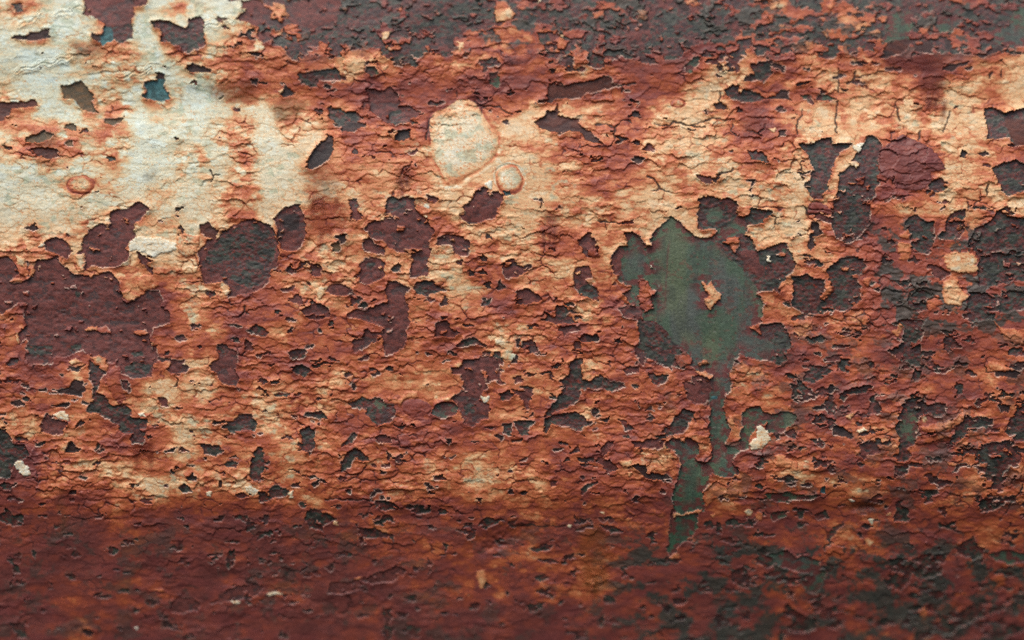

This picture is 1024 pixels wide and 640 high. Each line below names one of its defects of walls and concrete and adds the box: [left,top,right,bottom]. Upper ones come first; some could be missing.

peeling [151,0,1024,175]
crack [595,92,767,140]
crack [796,110,804,135]
crack [835,68,871,135]
crack [895,102,952,141]
crack [647,175,671,193]
crack [770,163,820,226]
peeling [0,131,1024,640]